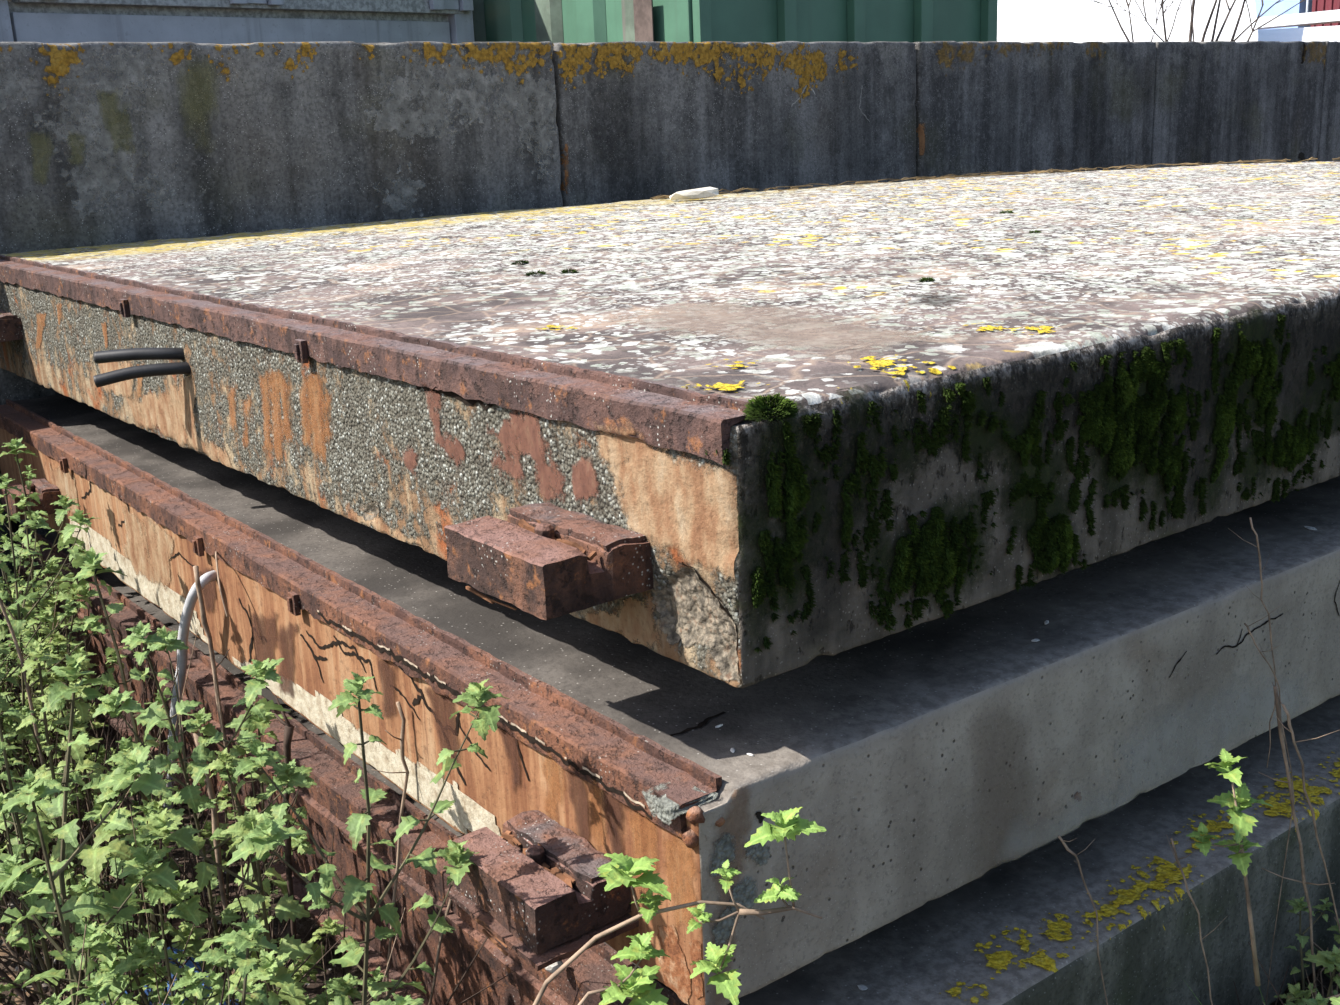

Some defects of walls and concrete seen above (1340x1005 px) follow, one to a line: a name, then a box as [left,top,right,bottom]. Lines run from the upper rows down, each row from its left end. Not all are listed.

rust [228,372,330,460]
rust [420,380,465,467]
rust [487,410,599,505]
rust [199,569,216,612]
crack [239,599,254,676]
rust [252,613,297,696]
rust [378,660,395,717]
rust [425,688,458,760]
crack [300,610,651,819]
rust [497,723,519,786]
crack [670,711,726,736]
crack [1169,613,1283,678]